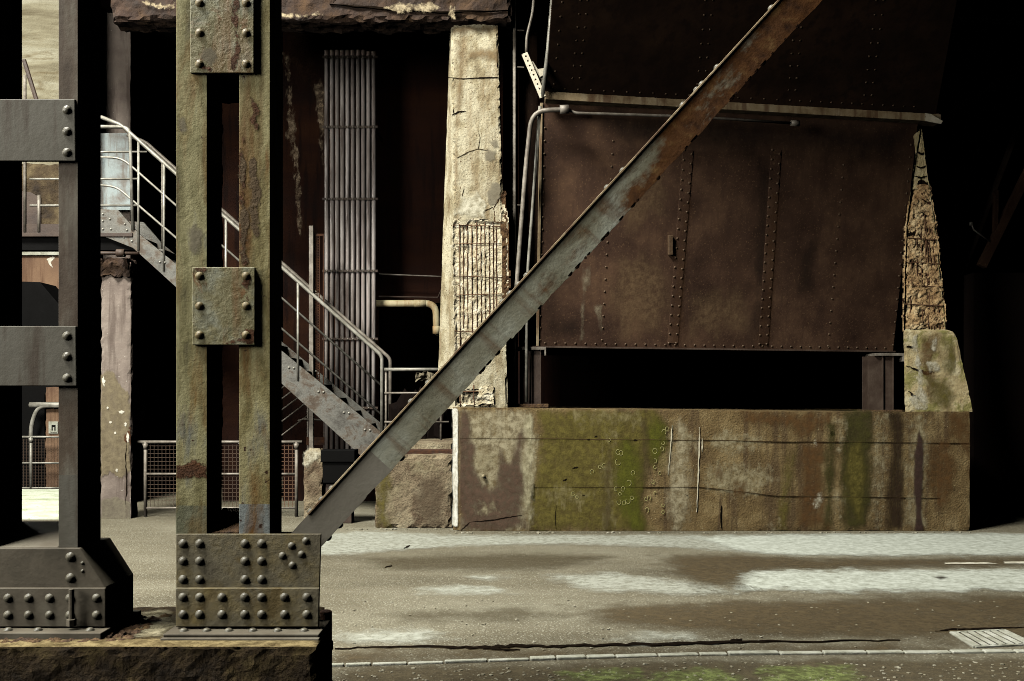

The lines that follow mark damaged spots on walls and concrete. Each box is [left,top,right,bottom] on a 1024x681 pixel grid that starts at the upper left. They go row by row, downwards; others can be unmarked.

crack [447,74,497,82]
rust [249,98,260,130]
peeling [485,140,498,161]
spalling [450,182,511,353]
spalling [901,179,947,331]
damp [874,334,939,531]
rust [176,459,206,479]
crack [335,638,900,652]